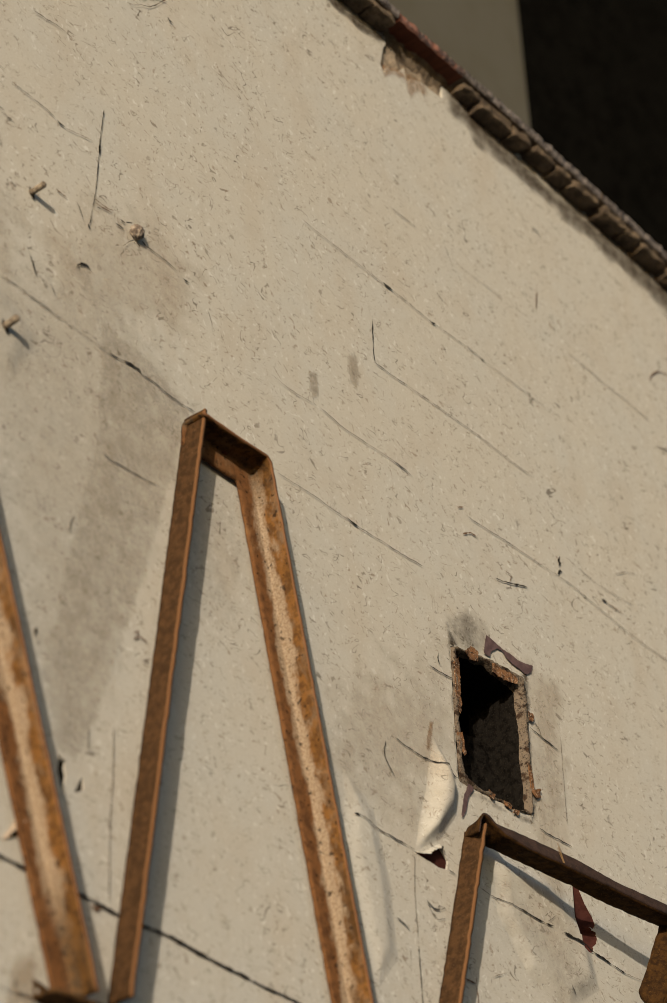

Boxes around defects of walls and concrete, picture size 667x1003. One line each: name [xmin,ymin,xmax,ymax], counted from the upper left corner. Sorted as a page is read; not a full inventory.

peeling [484,635,533,674]
spalling [459,707,470,736]
crack [384,737,458,778]
peeling [462,784,474,817]
crack [0,854,25,870]
crack [79,893,119,916]
crack [481,888,640,980]
crack [143,924,300,1003]